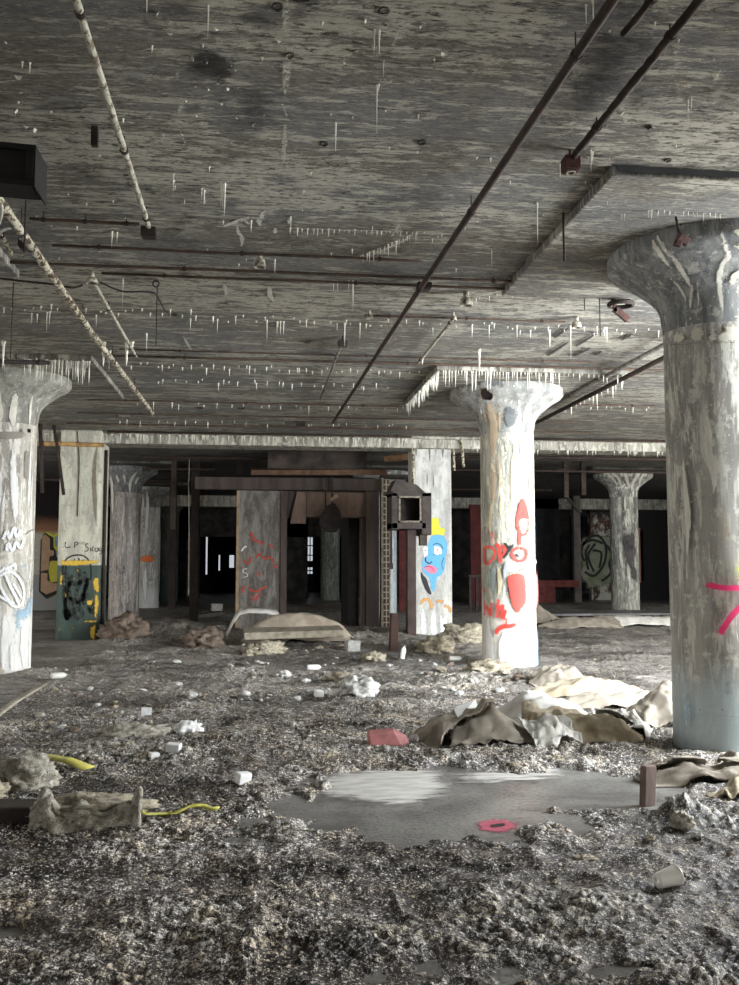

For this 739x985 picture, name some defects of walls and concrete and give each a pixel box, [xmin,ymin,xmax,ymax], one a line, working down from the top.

peeling [673,316,739,344]
water stain [504,398,532,427]